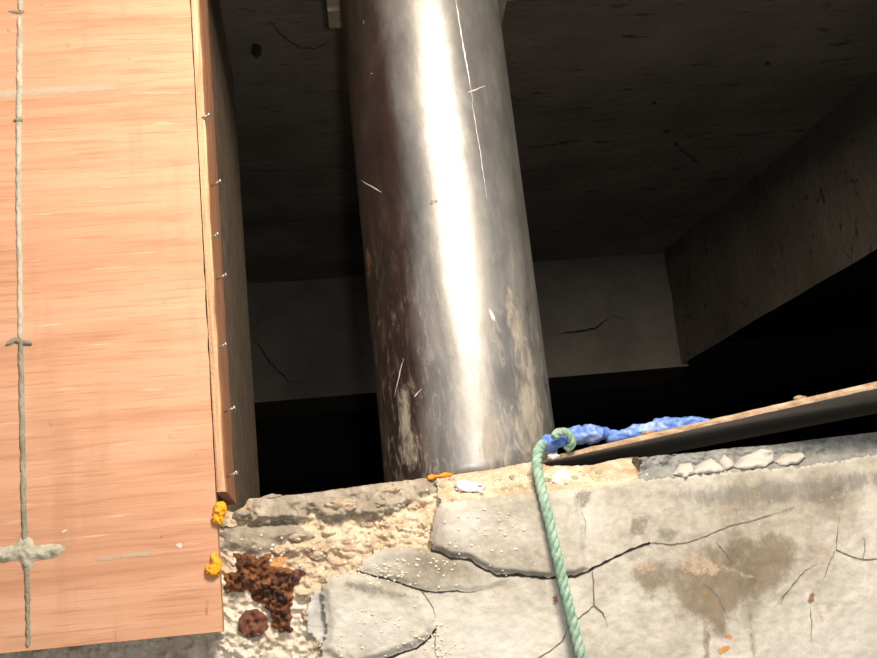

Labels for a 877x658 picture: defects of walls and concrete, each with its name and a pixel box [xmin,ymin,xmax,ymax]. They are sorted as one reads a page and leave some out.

rust [223,553,305,633]
spalling [0,432,877,658]
crack [360,506,795,658]
water stain [636,535,790,653]
crack [777,517,877,604]